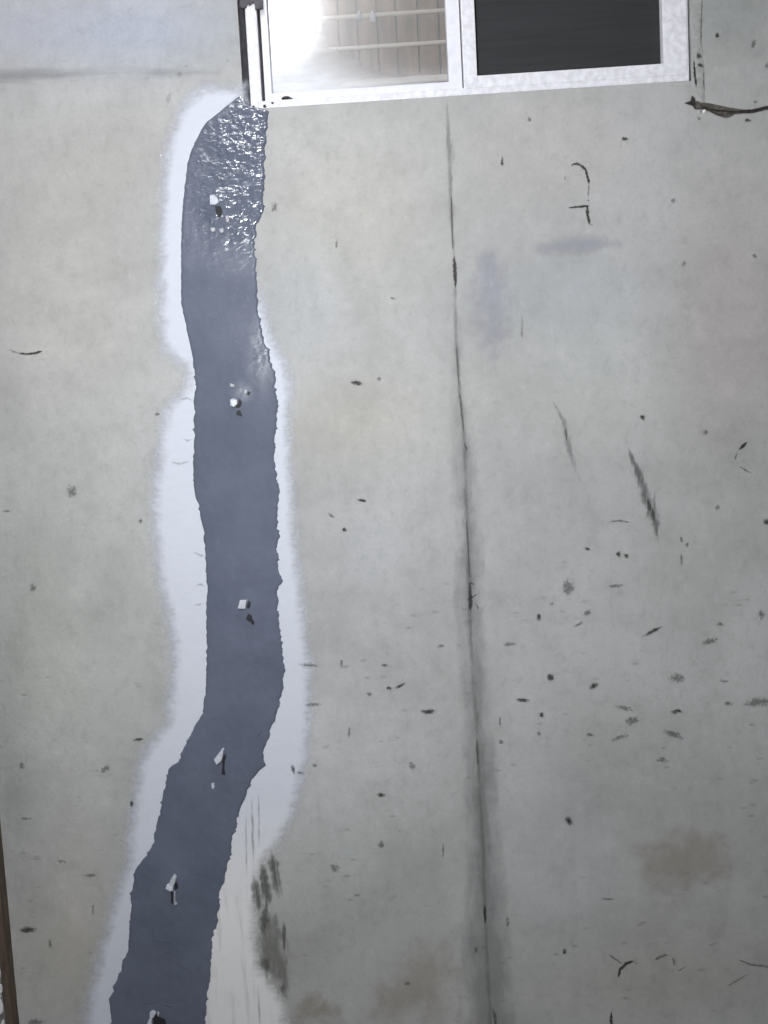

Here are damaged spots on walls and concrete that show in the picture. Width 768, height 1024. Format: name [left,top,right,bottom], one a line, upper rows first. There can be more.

crack [569,163,590,225]
crack [451,258,459,288]
leakage [85,86,243,1024]
crack [466,583,474,611]
leakage [205,297,311,1024]